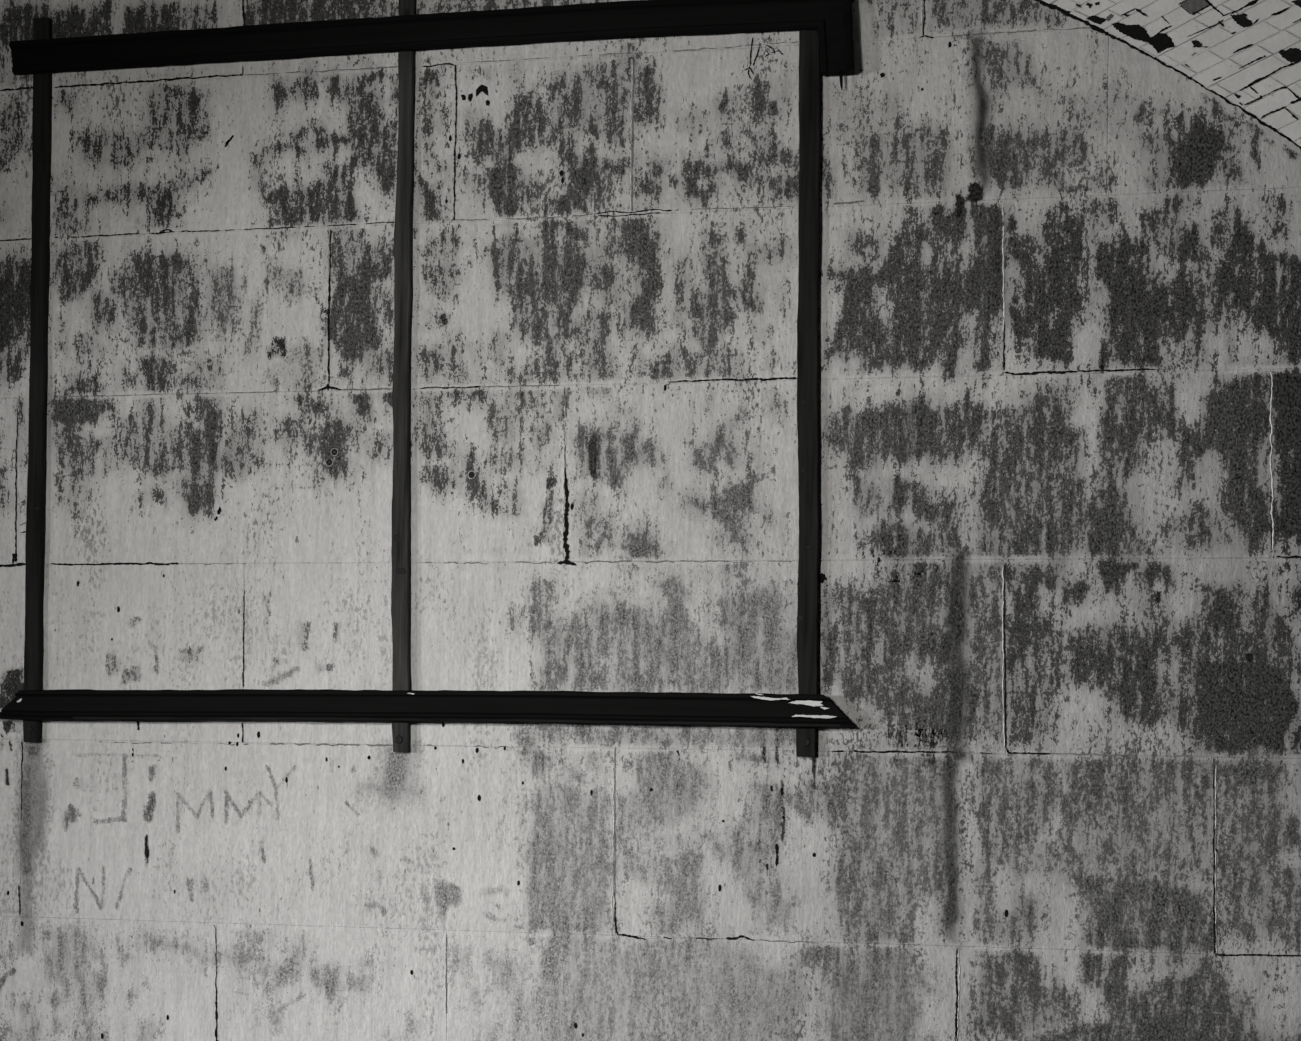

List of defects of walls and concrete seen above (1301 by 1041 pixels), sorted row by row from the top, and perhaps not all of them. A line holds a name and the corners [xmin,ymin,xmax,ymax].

crack [238,0,246,26]
spalling [1076,2,1175,53]
peeling [1181,0,1209,15]
peeling [1231,13,1253,28]
peeling [1278,48,1301,63]
crack [833,198,864,206]
leakage [46,54,399,533]
crack [0,41,799,566]
leakage [0,244,31,519]
leakage [411,0,1301,1041]
leakage [106,645,160,684]